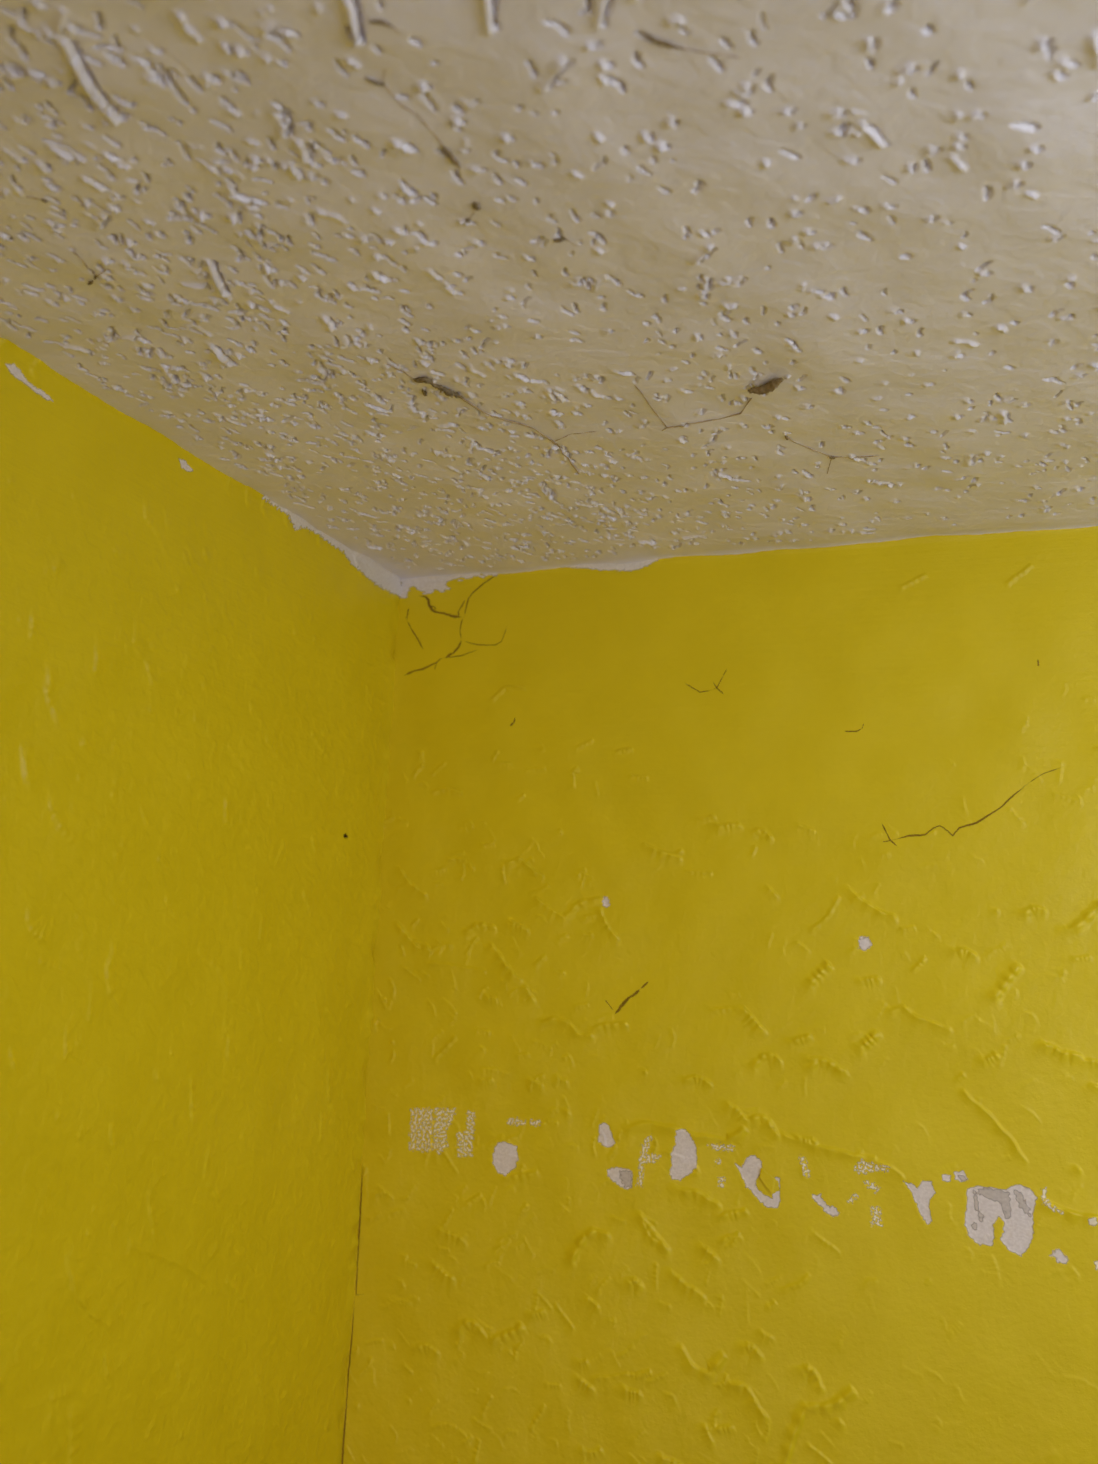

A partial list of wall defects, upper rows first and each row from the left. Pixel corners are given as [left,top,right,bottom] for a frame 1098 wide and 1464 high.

crack [406,576,507,675]
crack [882,768,1059,846]
peeling [493,1142,519,1176]
peeling [598,1123,615,1147]
peeling [607,1167,633,1189]
peeling [670,1129,697,1181]
peeling [736,1155,780,1208]
peeling [812,1194,839,1216]
peeling [905,1170,1037,1256]
peeling [1051,1249,1068,1263]